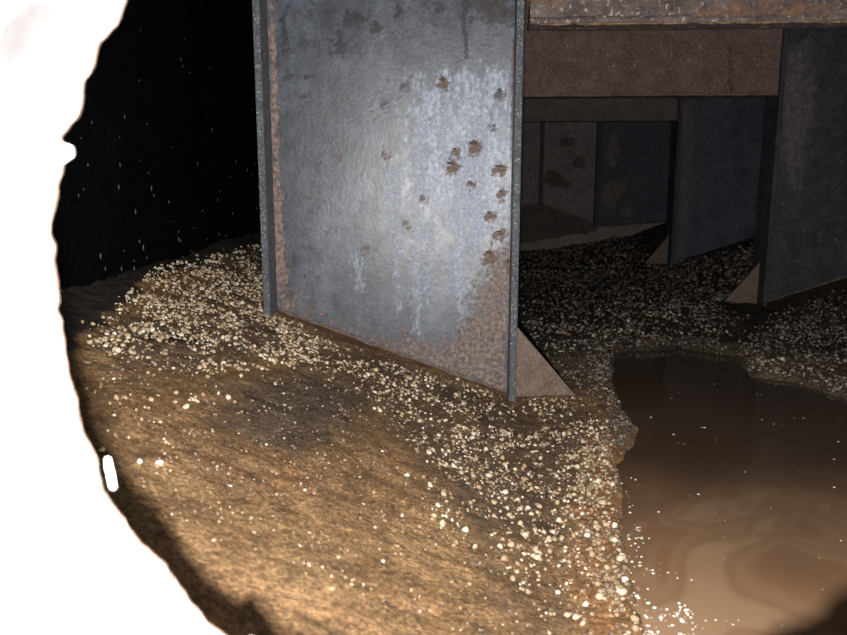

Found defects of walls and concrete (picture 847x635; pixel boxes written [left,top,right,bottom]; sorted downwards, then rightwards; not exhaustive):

rust [268,0,596,389]
water stain [381,0,514,342]